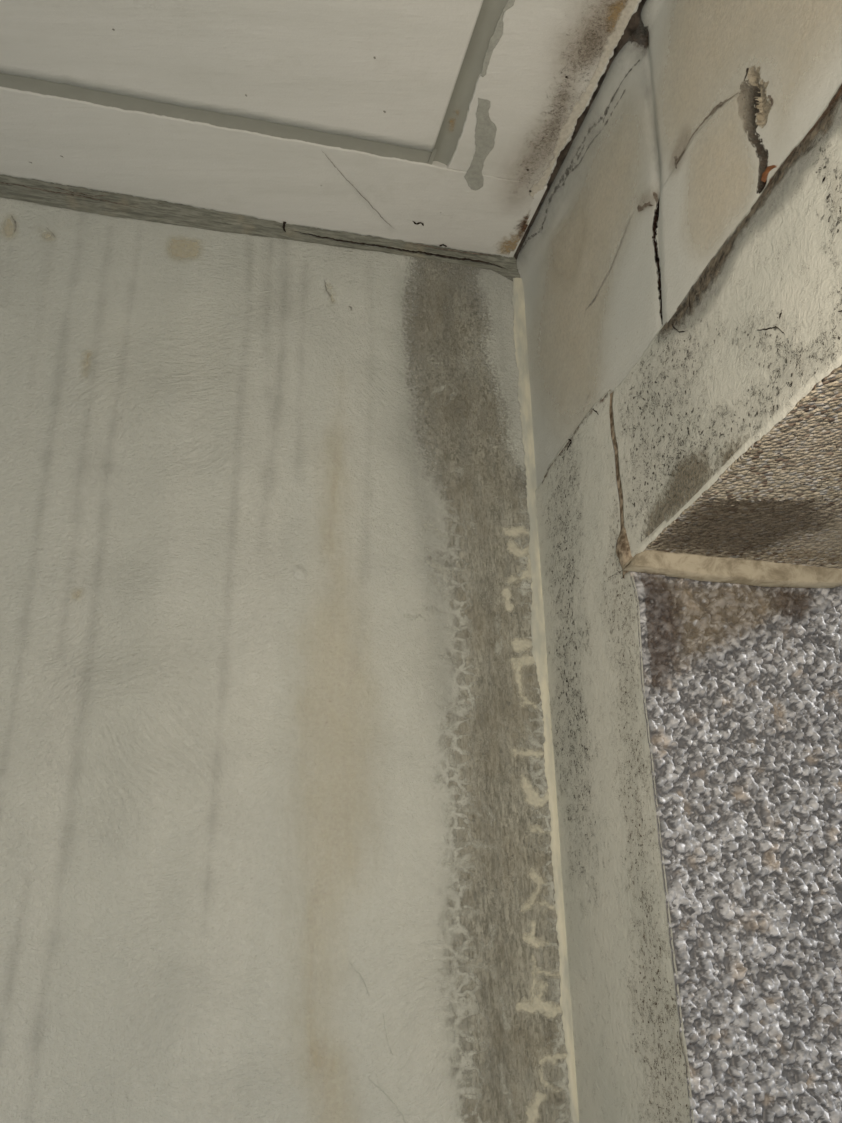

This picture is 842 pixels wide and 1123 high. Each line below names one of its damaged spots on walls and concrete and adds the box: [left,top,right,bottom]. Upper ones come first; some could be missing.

peeling [465,98,496,190]
crack [687,80,769,194]
water stain [765,84,842,248]
crack [586,192,691,333]
water stain [404,257,597,1123]
water stain [601,285,842,1123]